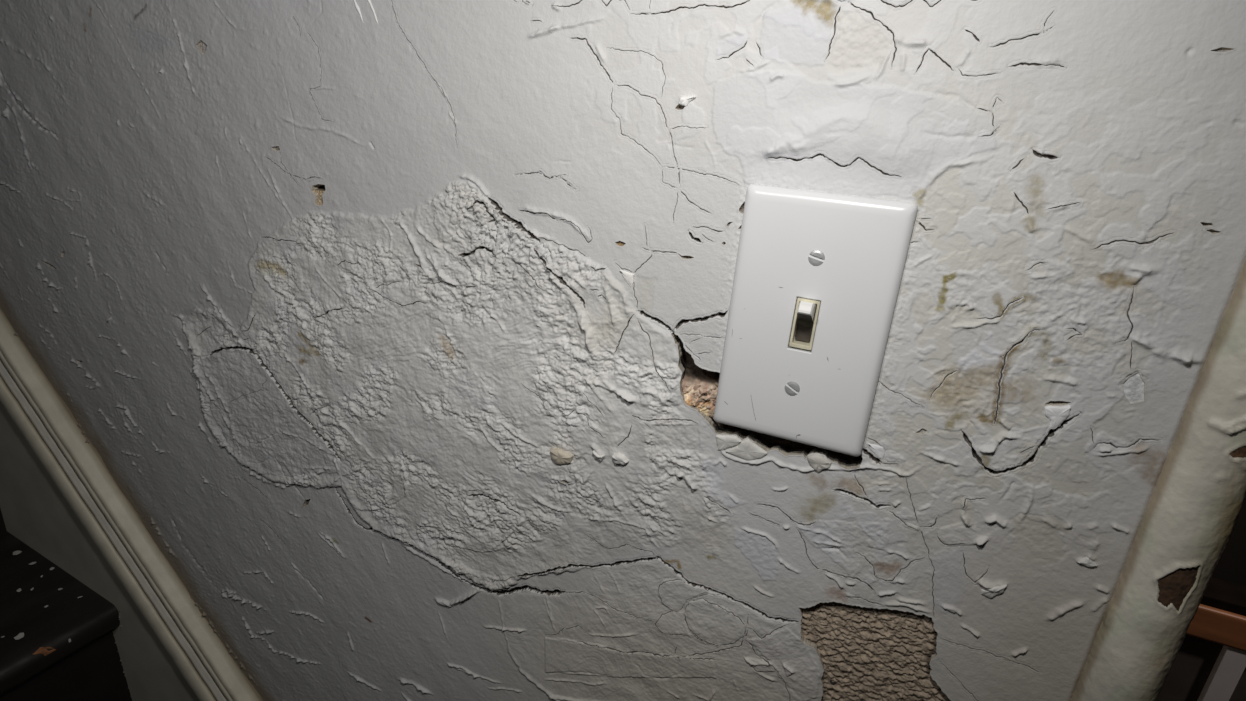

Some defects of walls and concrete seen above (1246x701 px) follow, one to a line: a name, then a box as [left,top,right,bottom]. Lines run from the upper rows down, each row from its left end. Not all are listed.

damp [798,0,832,20]
crack [822,0,1068,140]
spalling [310,182,327,207]
crack [313,0,757,449]
spalling [676,252,695,262]
crack [764,151,905,180]
crack [1009,147,1082,217]
crack [195,310,800,701]
peeling [550,448,574,485]
crack [702,259,1162,701]
peeling [1158,566,1199,611]
spalling [798,600,954,701]